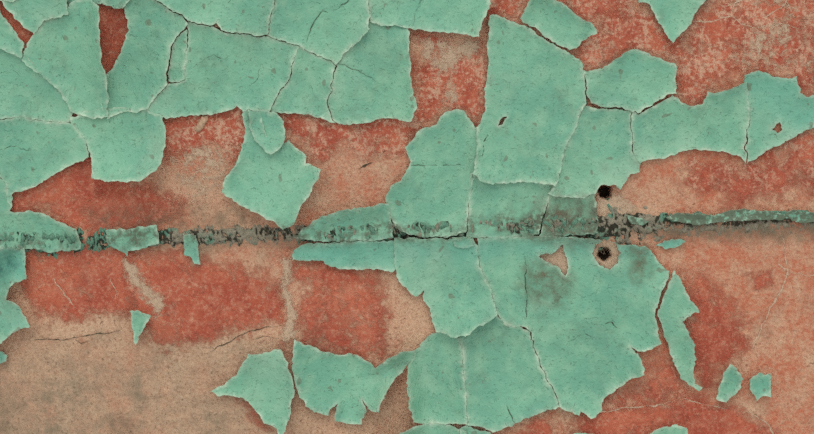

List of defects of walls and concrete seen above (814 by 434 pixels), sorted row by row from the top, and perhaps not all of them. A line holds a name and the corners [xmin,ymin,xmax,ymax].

crack [155,0,375,122]
peeling [281,14,814,434]
peeling [0,234,286,347]
peeling [210,349,295,434]